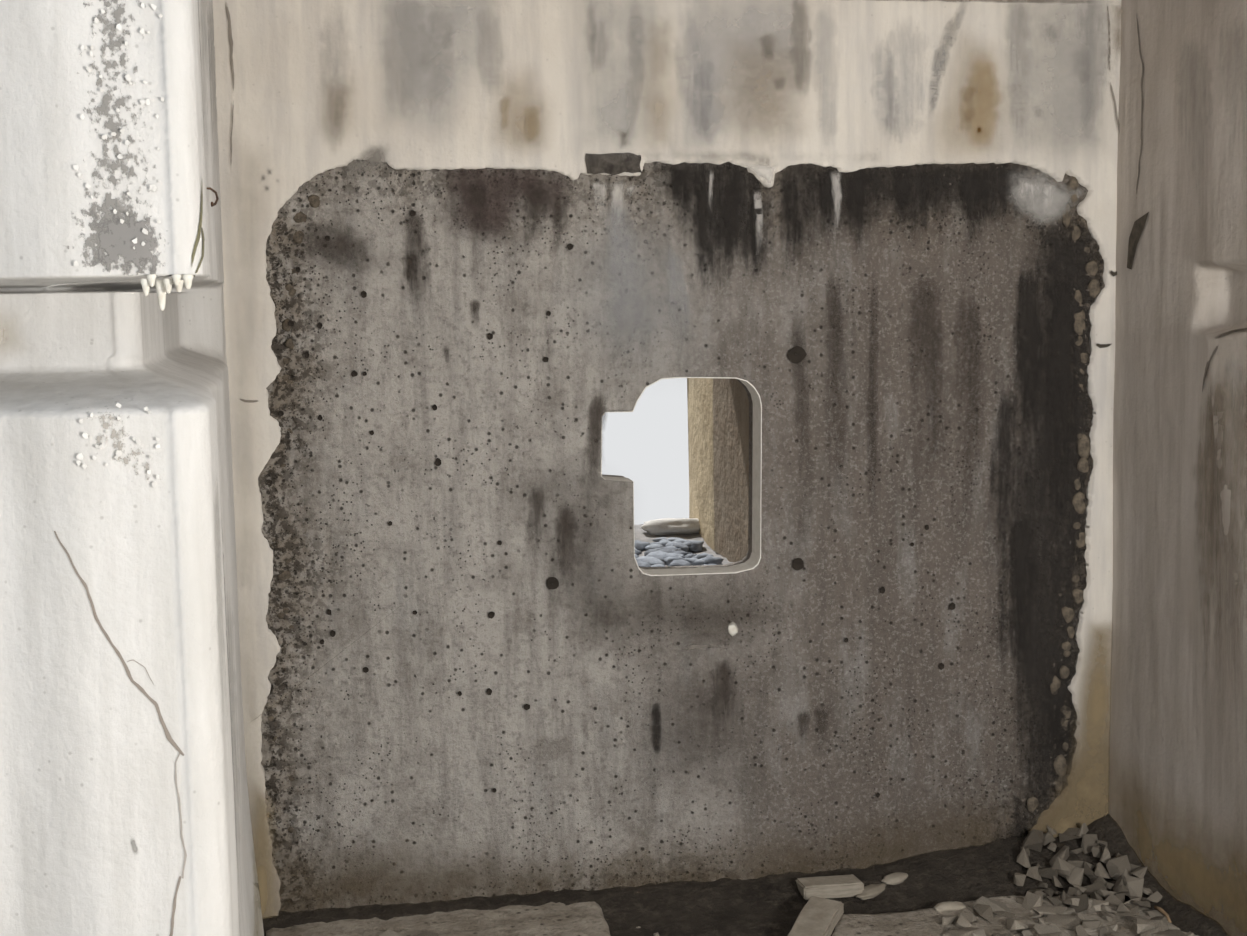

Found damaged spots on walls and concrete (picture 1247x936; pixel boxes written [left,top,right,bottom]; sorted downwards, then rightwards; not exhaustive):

peeling [68,0,164,276]
damp [406,216,423,278]
damp [450,168,564,235]
damp [593,183,633,217]
damp [664,162,767,266]
damp [590,398,605,466]
damp [533,492,542,527]
damp [558,509,573,563]
spalling [258,160,1105,913]
damp [783,162,1096,837]
crack [54,531,187,936]
damp [652,705,661,751]